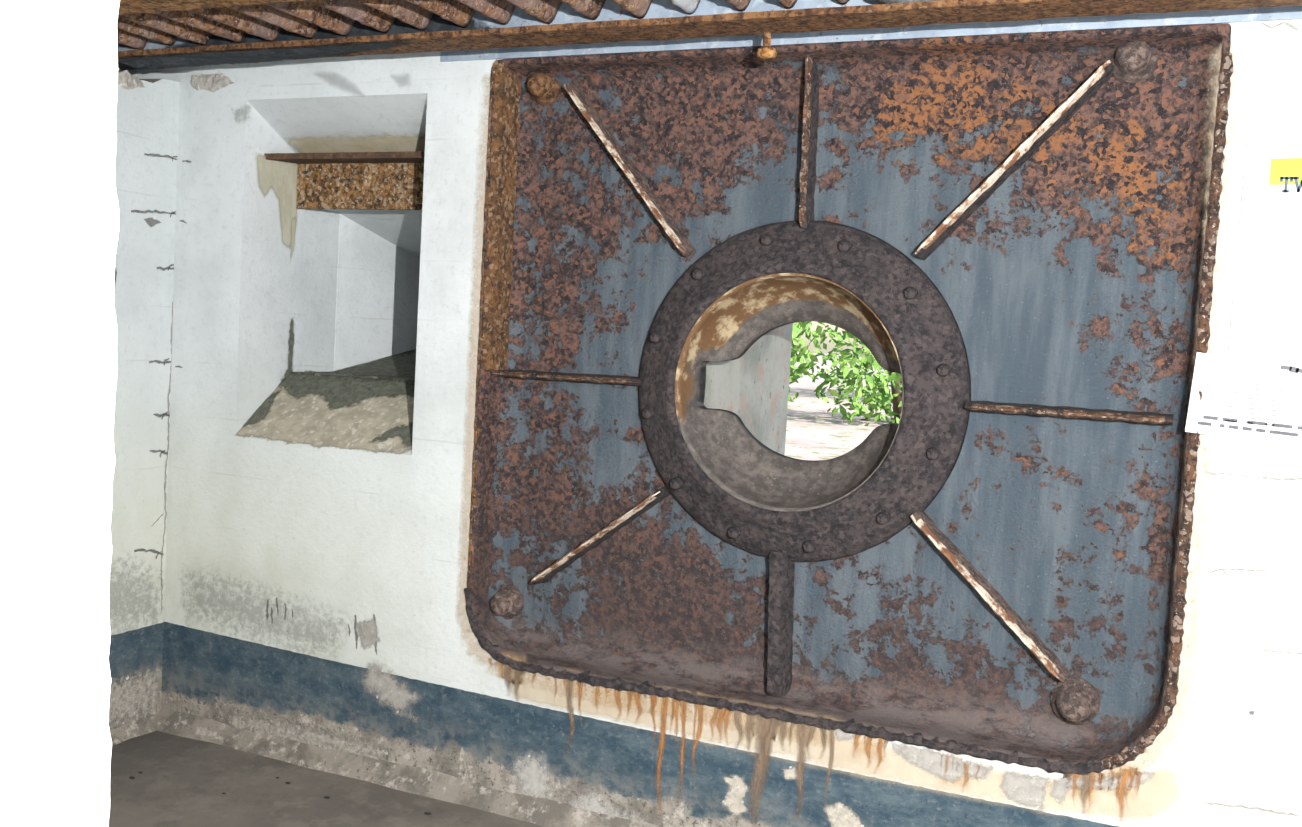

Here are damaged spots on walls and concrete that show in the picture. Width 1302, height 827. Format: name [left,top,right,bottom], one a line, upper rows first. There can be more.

crack [144,153,192,163]
crack [131,209,186,223]
rust [1208,85,1234,355]
crack [134,303,182,611]
rust [459,84,1009,816]
rust [1042,434,1209,817]
peeling [108,667,162,729]
peeling [722,776,748,816]
peeling [783,766,798,780]
peeling [824,802,864,827]